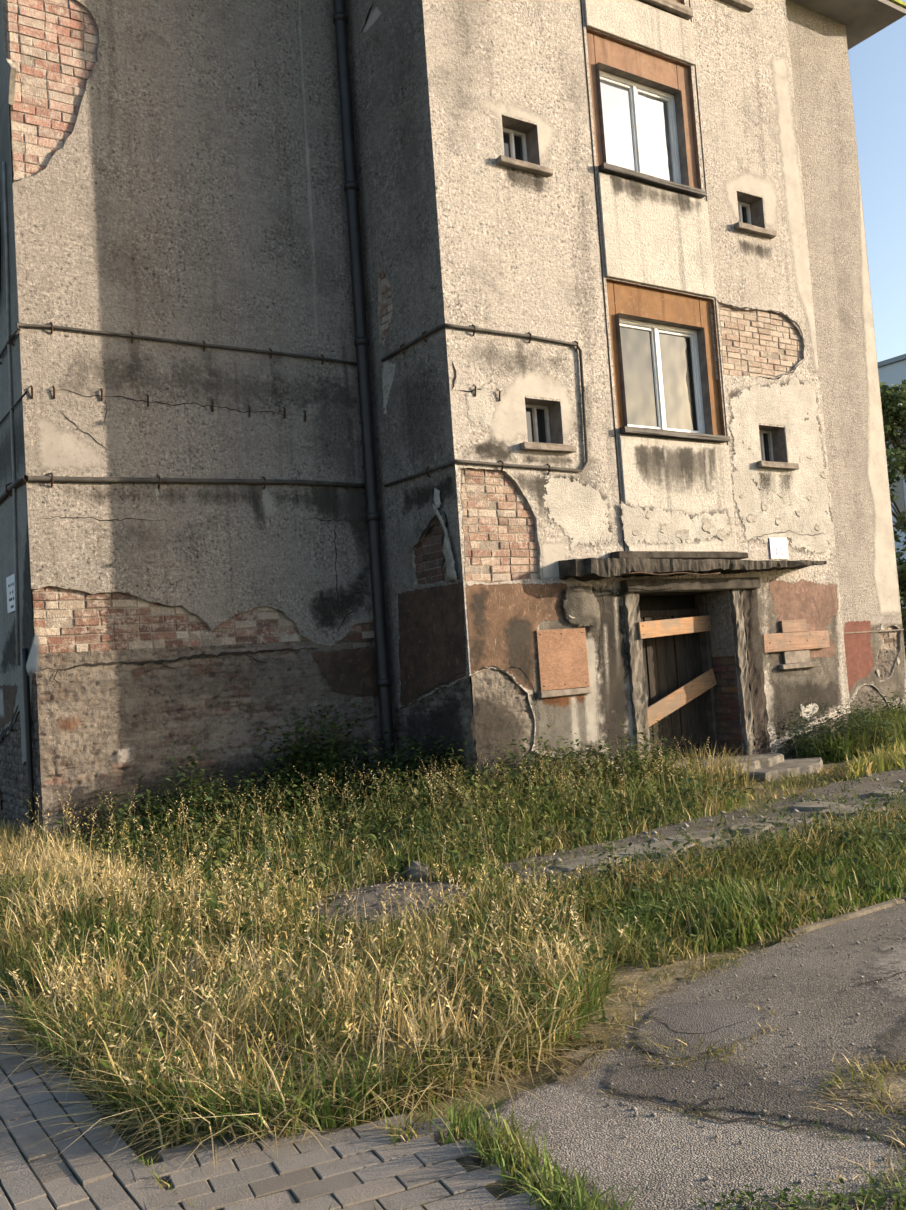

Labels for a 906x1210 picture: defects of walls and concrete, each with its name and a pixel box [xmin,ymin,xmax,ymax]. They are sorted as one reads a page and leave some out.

flaking render [2,0,100,182]
crack [50,389,301,450]
water stain [636,446,715,490]
peeling [395,299,834,751]
water stain [312,574,367,629]
flaking render [32,586,378,696]
peeling [0,671,40,742]
crack [604,1090,810,1128]